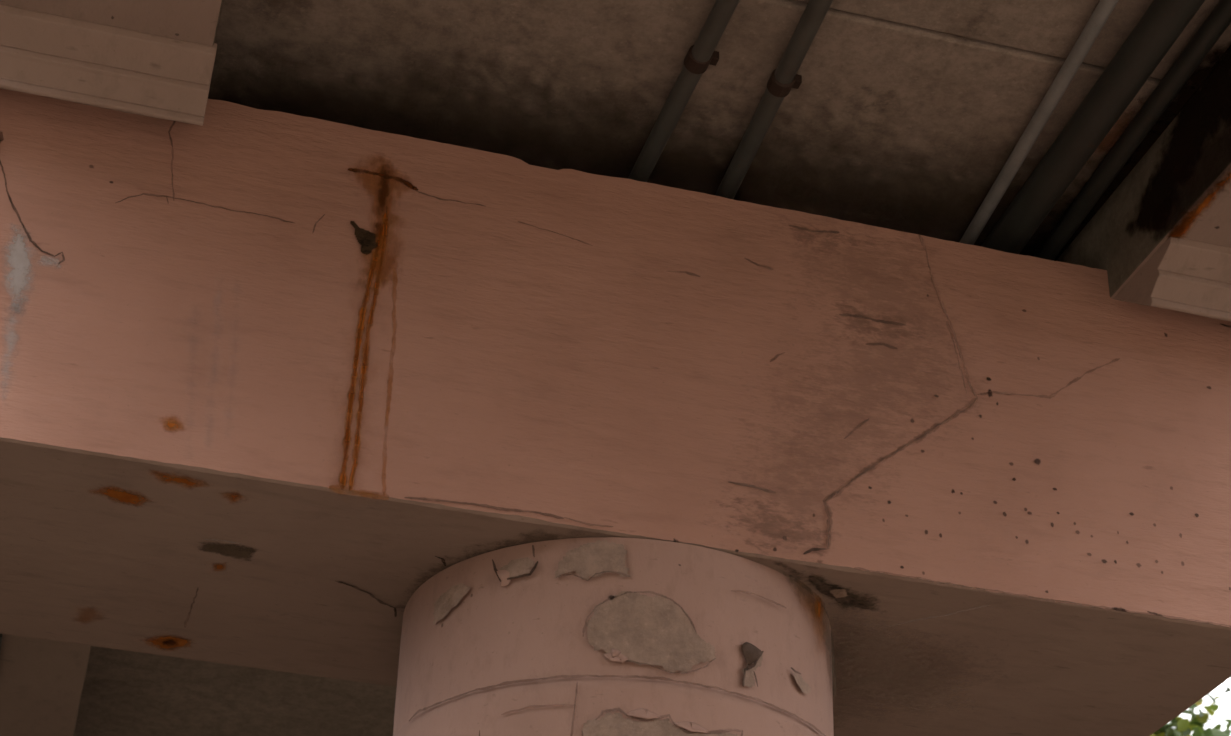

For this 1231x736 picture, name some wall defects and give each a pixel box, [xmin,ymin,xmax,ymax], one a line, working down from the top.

crack [0,161,65,265]
crack [116,121,325,232]
leakage [7,230,31,312]
rust [329,158,419,498]
rust [95,488,148,506]
crack [803,382,1003,554]
crack [854,567,1231,627]
rust [146,636,189,650]
peeling [742,642,764,688]
peeling [582,708,743,736]